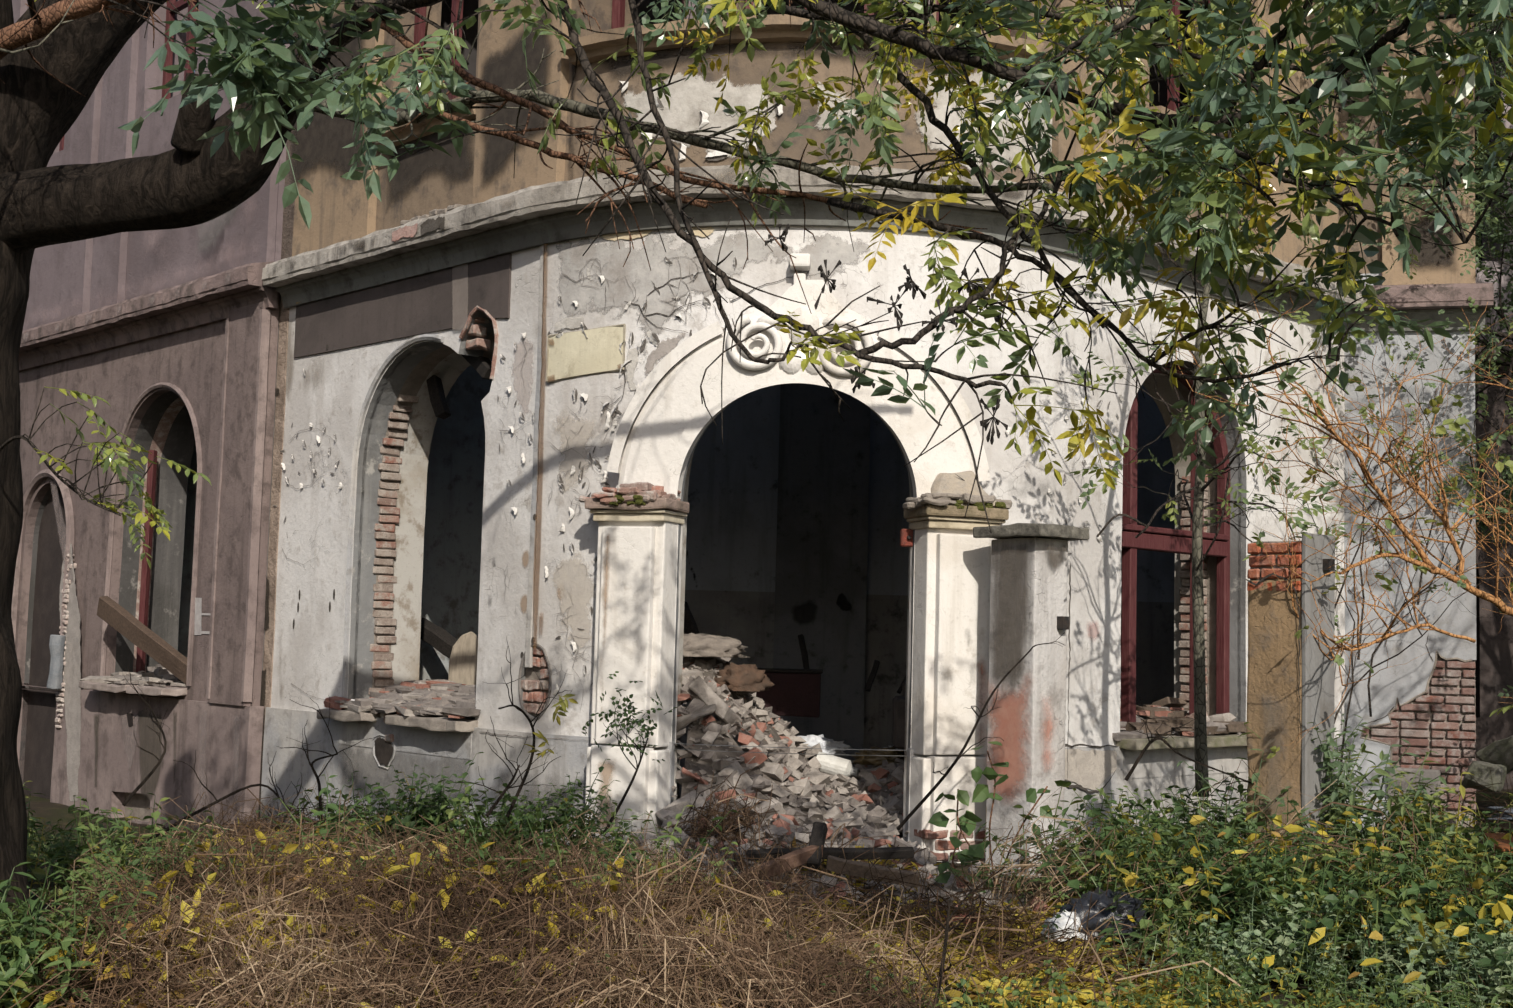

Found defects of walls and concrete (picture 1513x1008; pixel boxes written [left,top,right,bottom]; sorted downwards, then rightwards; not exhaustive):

peeling [459,227,870,720]
damp [980,546,1028,796]
damp [1048,545,1066,568]
spalling [1360,633,1476,810]